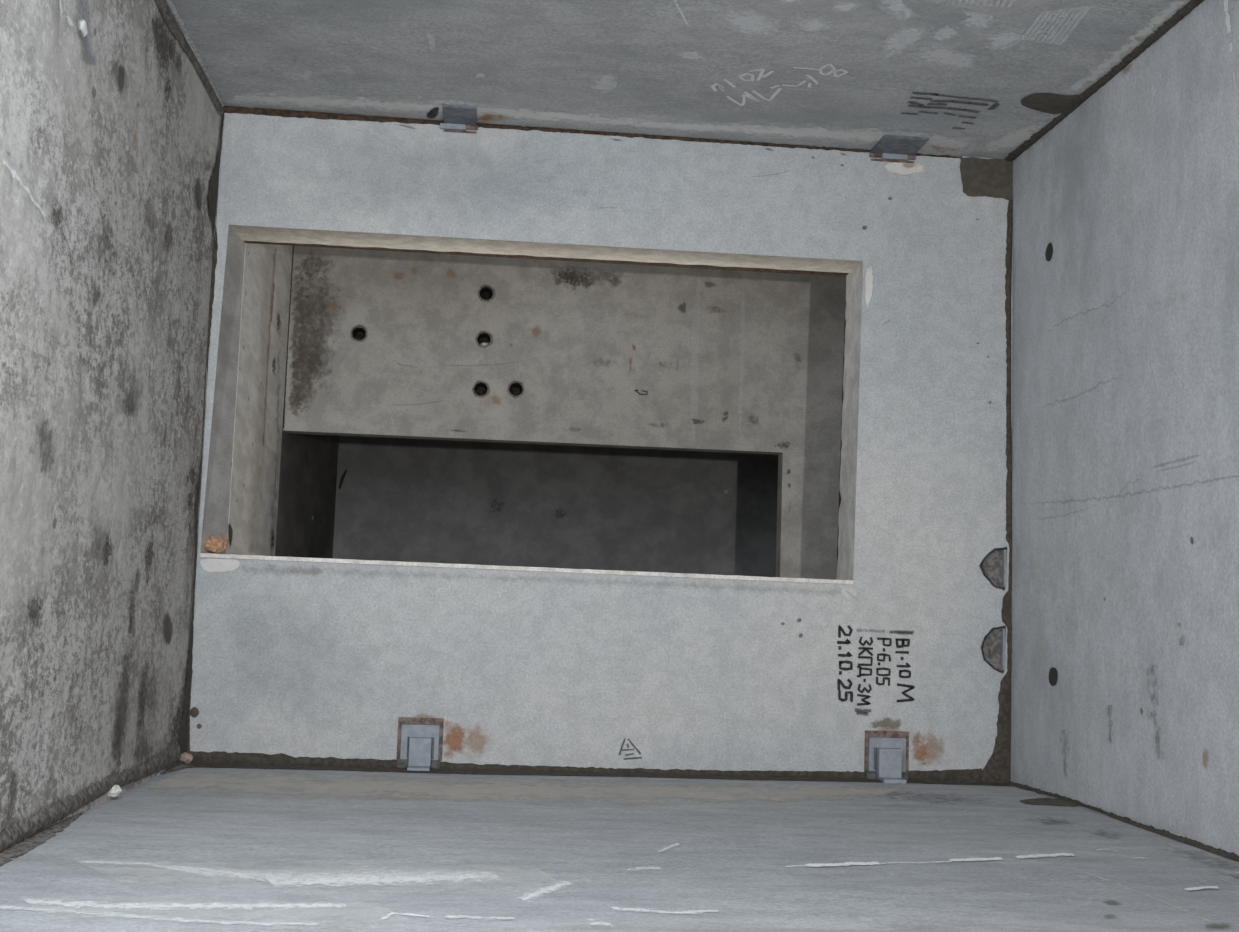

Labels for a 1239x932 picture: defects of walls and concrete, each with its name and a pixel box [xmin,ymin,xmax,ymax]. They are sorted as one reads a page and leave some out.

damp [152,9,182,101]
damp [39,419,54,472]
damp [102,534,112,567]
damp [27,594,45,627]
damp [129,541,156,633]
damp [165,613,173,644]
damp [114,653,150,765]